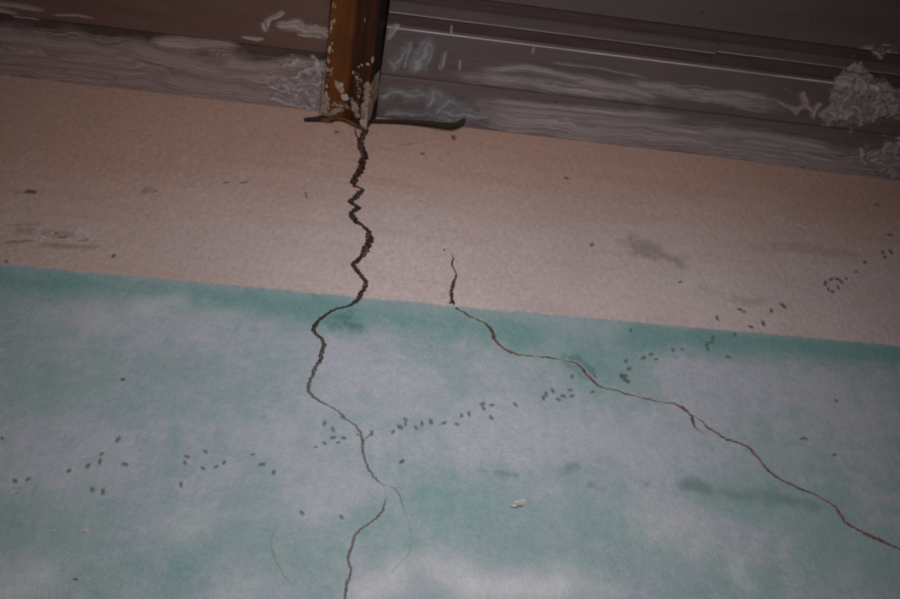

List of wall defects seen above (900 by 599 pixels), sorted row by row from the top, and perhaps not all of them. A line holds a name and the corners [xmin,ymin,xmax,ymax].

damp [778,64,900,125]
crack [306,128,412,599]
crack [443,249,900,550]